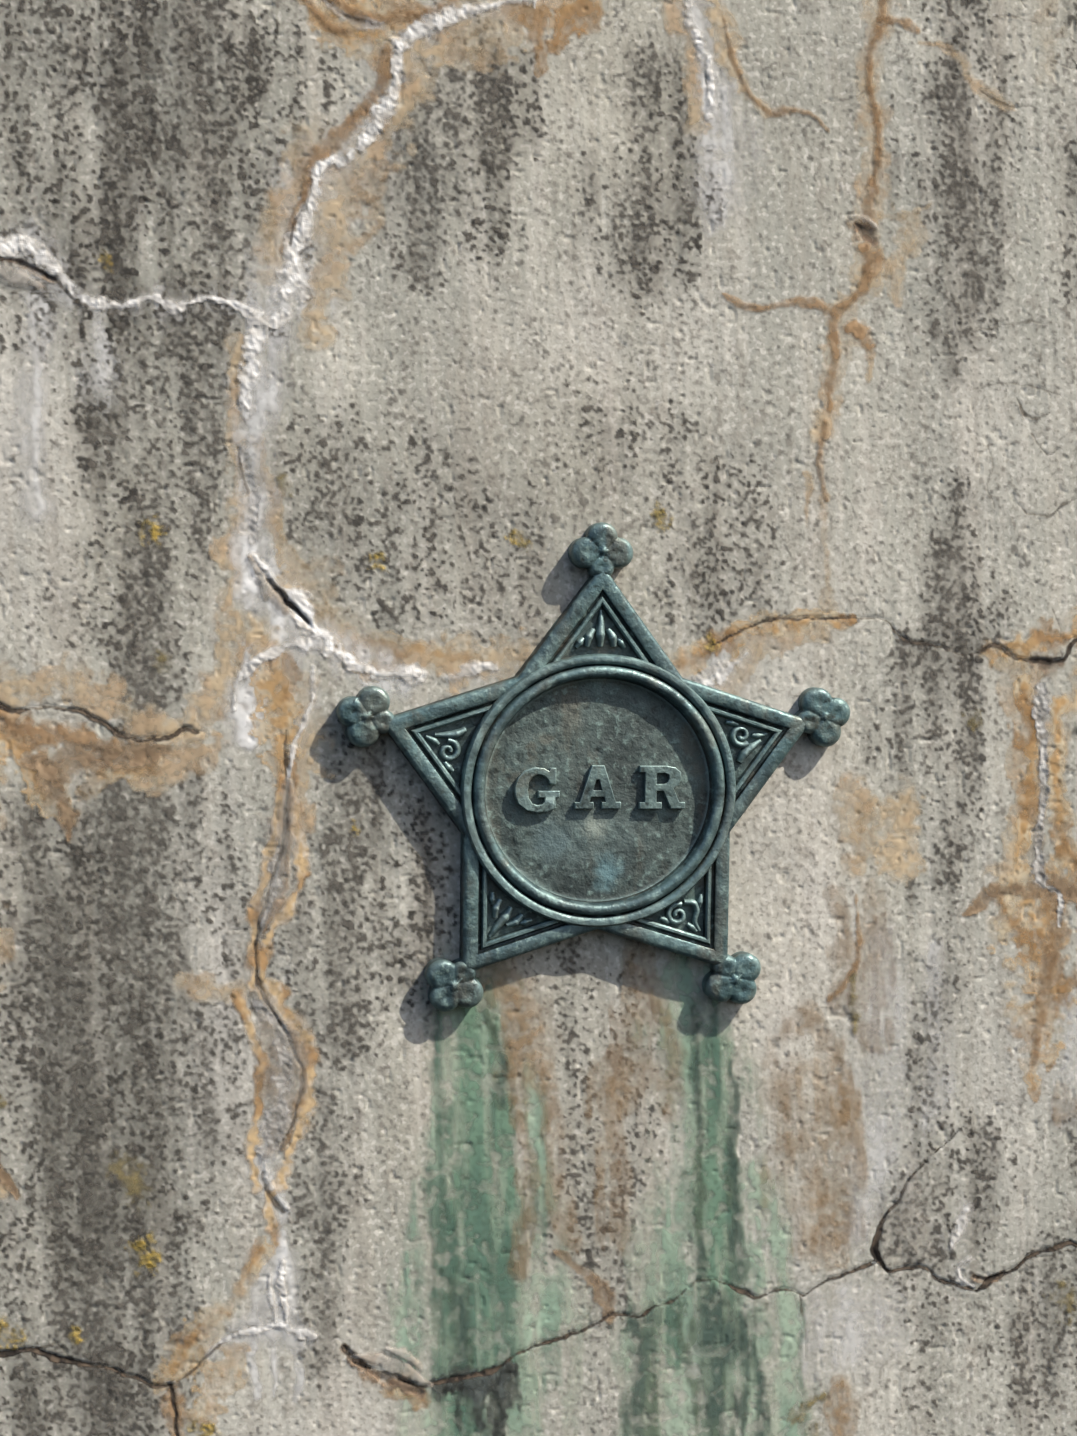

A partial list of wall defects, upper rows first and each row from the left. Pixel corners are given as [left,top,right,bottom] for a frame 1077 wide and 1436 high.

corrosion [267,0,476,349]
corrosion [792,231,917,460]
damp [896,0,1018,382]
crack [0,703,199,742]
corrosion [0,334,334,1275]
crack [266,578,309,624]
damp [0,0,850,1436]
crack [714,616,1077,664]
damp [843,471,1016,904]
corrosion [962,616,1077,1102]
crack [341,1131,1077,1388]
damp [869,939,1017,1431]